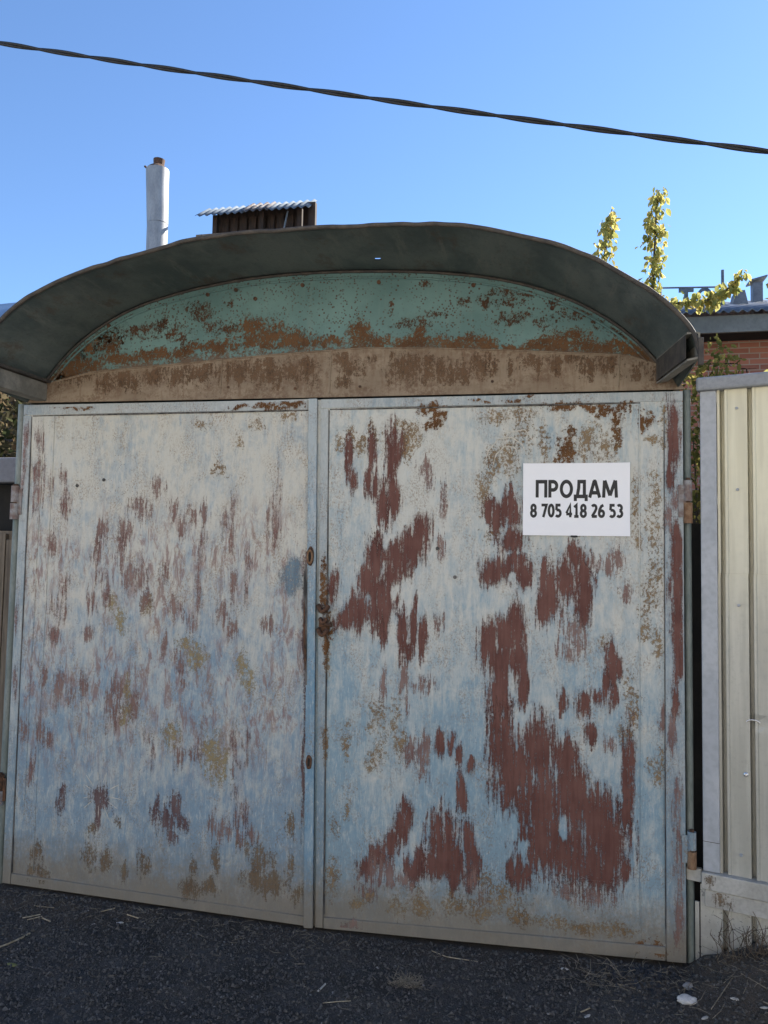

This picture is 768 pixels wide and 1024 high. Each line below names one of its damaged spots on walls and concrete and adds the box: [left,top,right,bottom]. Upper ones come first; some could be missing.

rust [51,313,663,395]
rust [335,400,448,466]
rust [618,669,643,745]
rust [80,820,152,882]
rust [177,843,220,903]
rust [235,838,304,909]
rust [284,810,295,840]